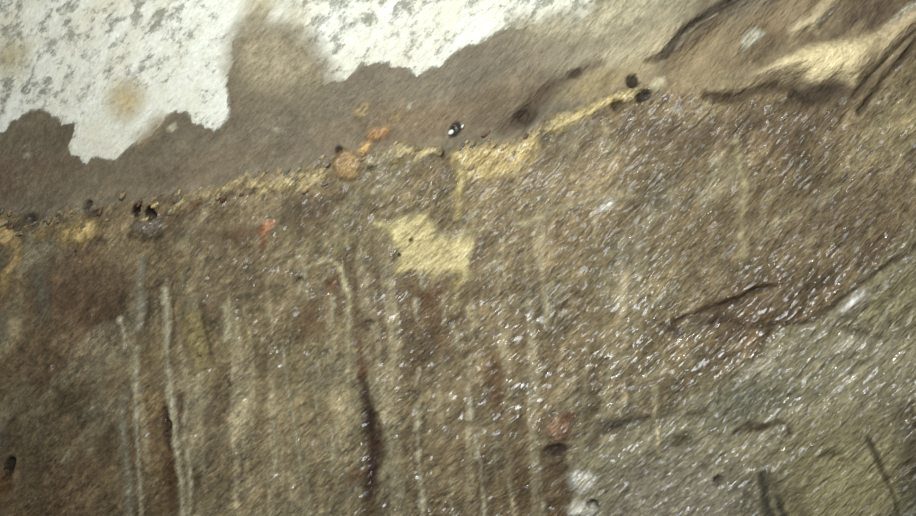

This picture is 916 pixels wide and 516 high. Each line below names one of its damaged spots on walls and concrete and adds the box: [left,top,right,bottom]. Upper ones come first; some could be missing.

leakage [233,0,330,100]
peeling [0,0,596,168]
peeling [742,28,763,49]
leakage [38,216,97,244]
spalling [131,192,164,222]
spalling [167,101,412,216]
leakage [297,259,352,428]
leakage [374,214,478,332]
leakage [839,291,873,318]
leakage [117,317,143,516]
leakage [161,287,193,516]
leakage [567,471,597,516]